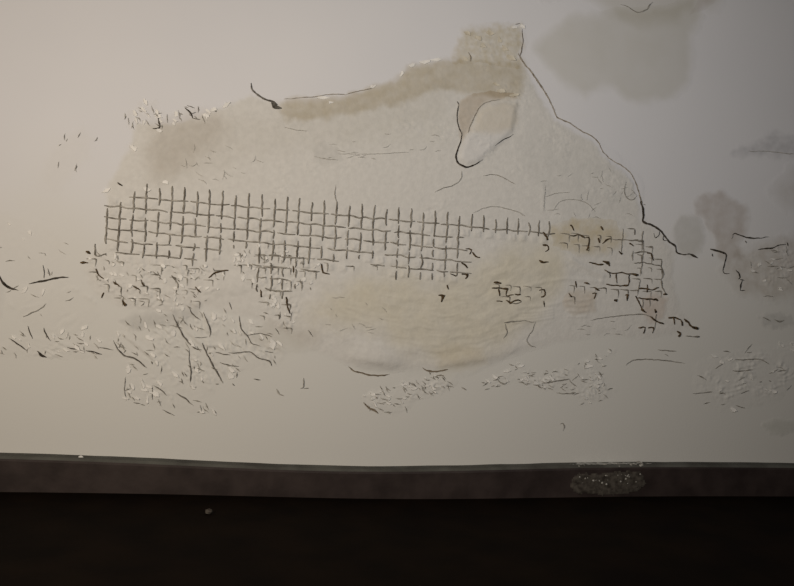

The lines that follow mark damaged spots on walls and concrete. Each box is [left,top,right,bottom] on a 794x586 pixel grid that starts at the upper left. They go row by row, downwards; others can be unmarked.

damp [526,0,727,110]
crack [437,100,513,191]
crack [518,23,744,291]
crack [0,267,68,290]
crack [9,305,145,367]
crack [124,303,279,416]
spalling [0,70,579,419]
spalling [480,222,696,407]
peeling [690,340,794,414]
crack [734,233,788,250]
spalling [570,461,652,496]